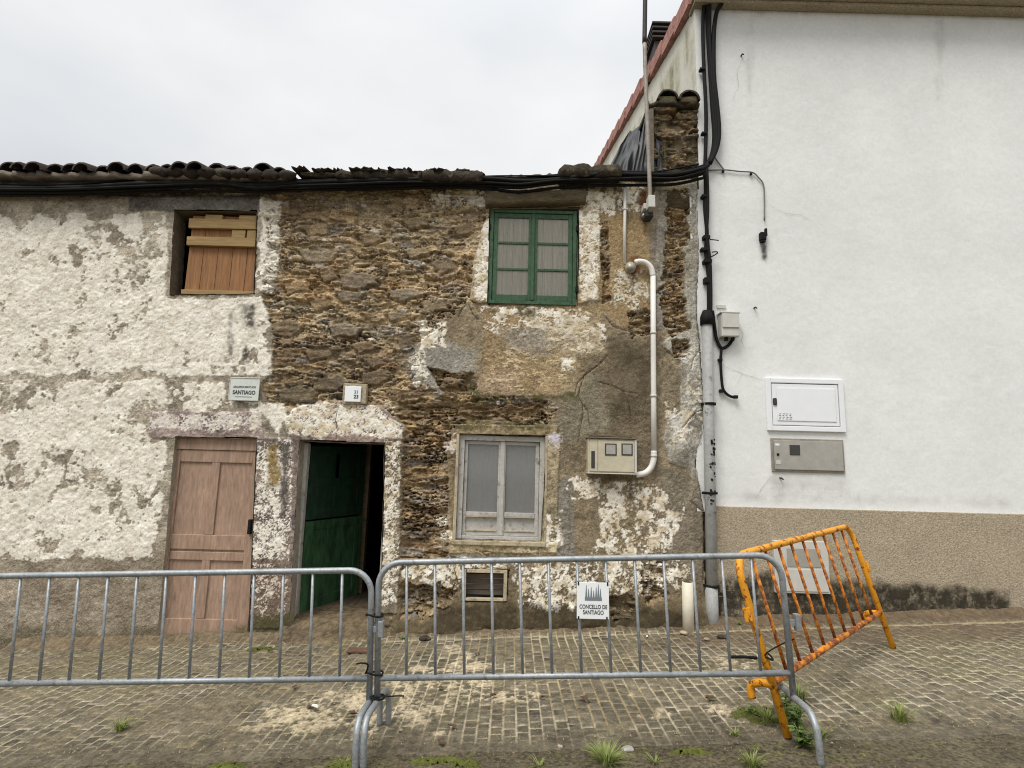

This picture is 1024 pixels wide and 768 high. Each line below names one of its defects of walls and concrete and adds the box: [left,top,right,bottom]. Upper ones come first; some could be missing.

peeling [0,183,703,622]
crack [575,362,632,435]
water stain [718,573,1009,617]